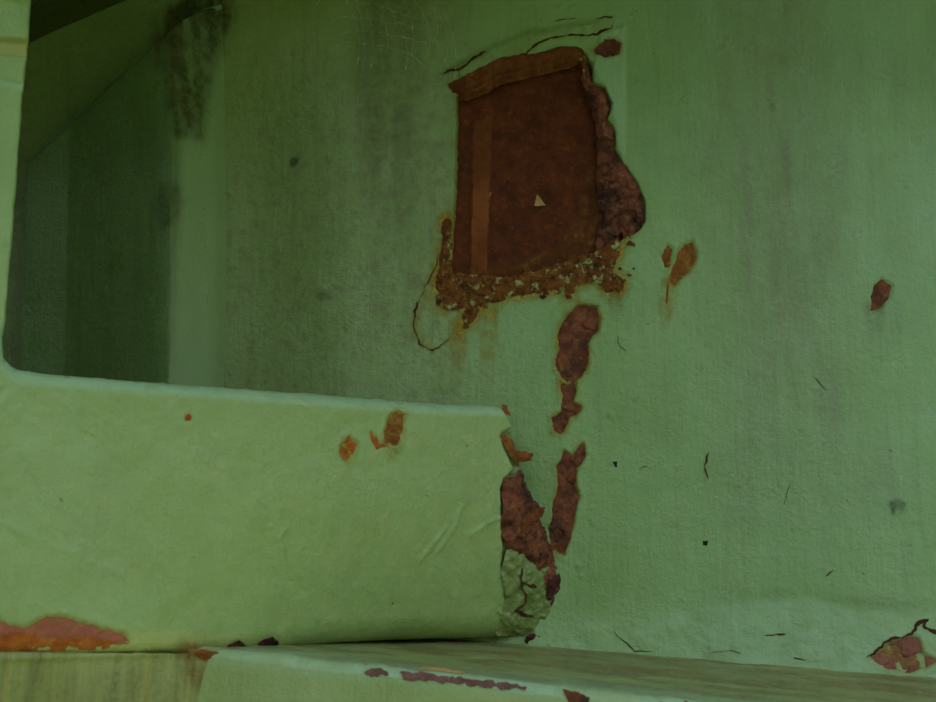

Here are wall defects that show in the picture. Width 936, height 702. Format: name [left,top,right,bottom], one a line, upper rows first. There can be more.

crack [444,51,486,78]
crack [520,16,614,83]
corrosion [593,38,621,58]
corrosion [431,46,645,351]
crack [413,258,450,351]
peeling [662,242,697,305]
peeling [870,279,891,311]
peeling [551,303,601,434]
peeling [370,410,405,450]
peeling [548,443,586,555]
peeling [0,616,130,652]
peeling [400,671,527,690]